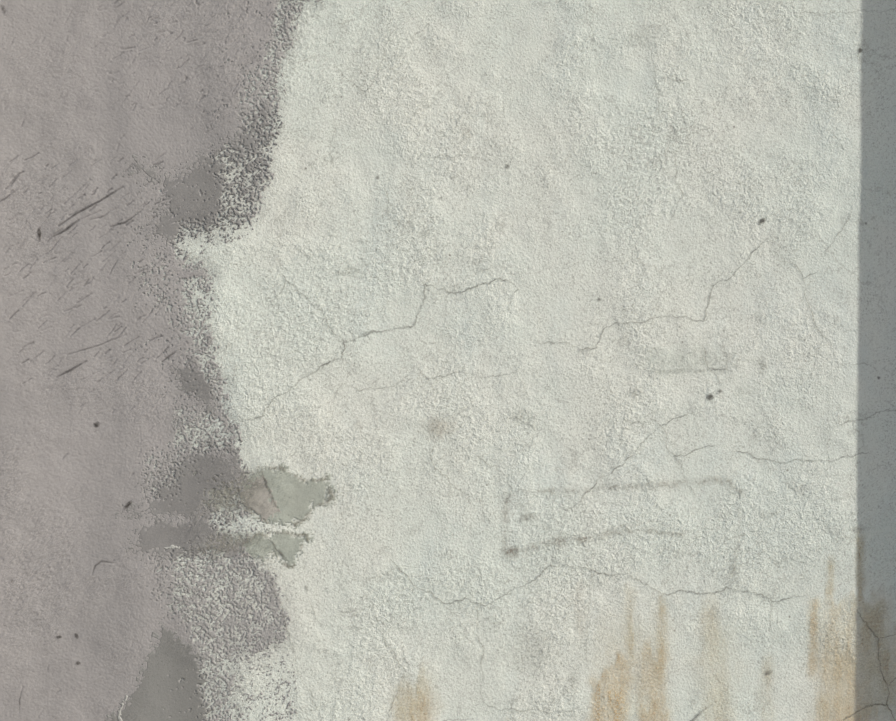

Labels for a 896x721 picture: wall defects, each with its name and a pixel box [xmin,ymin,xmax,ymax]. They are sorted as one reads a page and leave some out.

spalling [204,463,339,569]
crack [847,627,892,718]